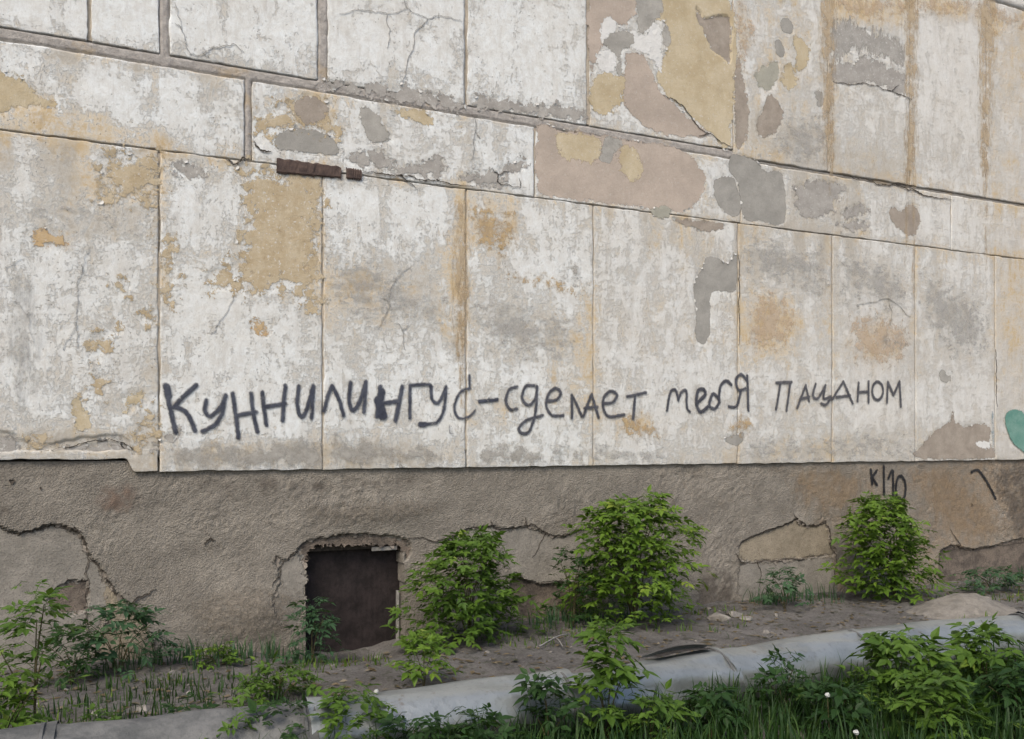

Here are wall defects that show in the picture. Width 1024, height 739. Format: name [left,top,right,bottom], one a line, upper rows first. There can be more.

peeling [0,70,58,117]
crack [340,0,460,79]
spalling [829,15,909,97]
peeling [199,0,871,315]
peeling [693,253,737,344]
peeling [913,411,995,460]
crack [0,524,155,652]
crack [403,517,576,586]
spalling [737,520,838,600]
spalling [938,538,1024,582]